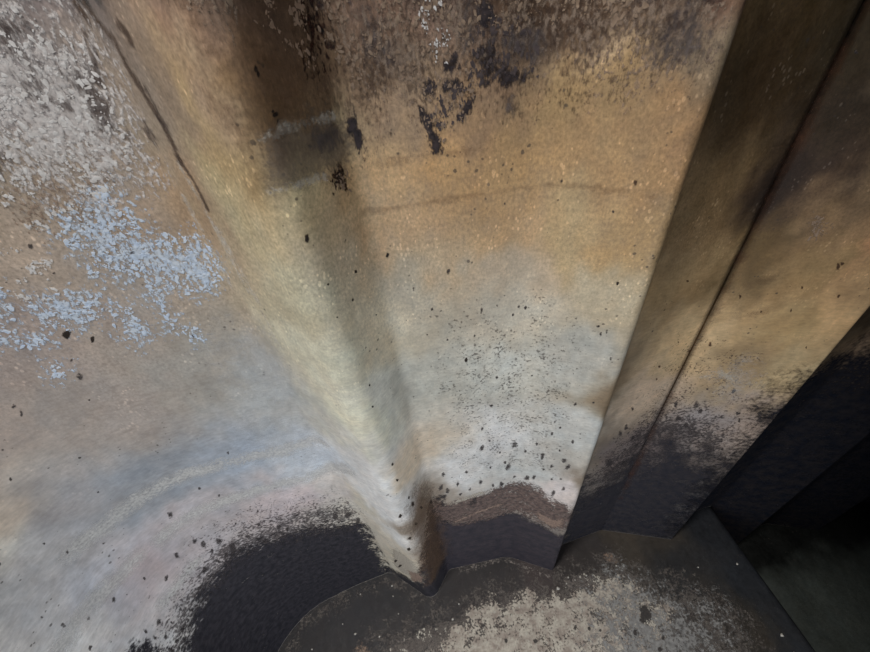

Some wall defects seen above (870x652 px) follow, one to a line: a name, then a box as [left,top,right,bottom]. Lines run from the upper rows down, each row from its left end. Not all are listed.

peeling [418,0,541,155]
peeling [565,0,732,94]
peeling [345,108,363,154]